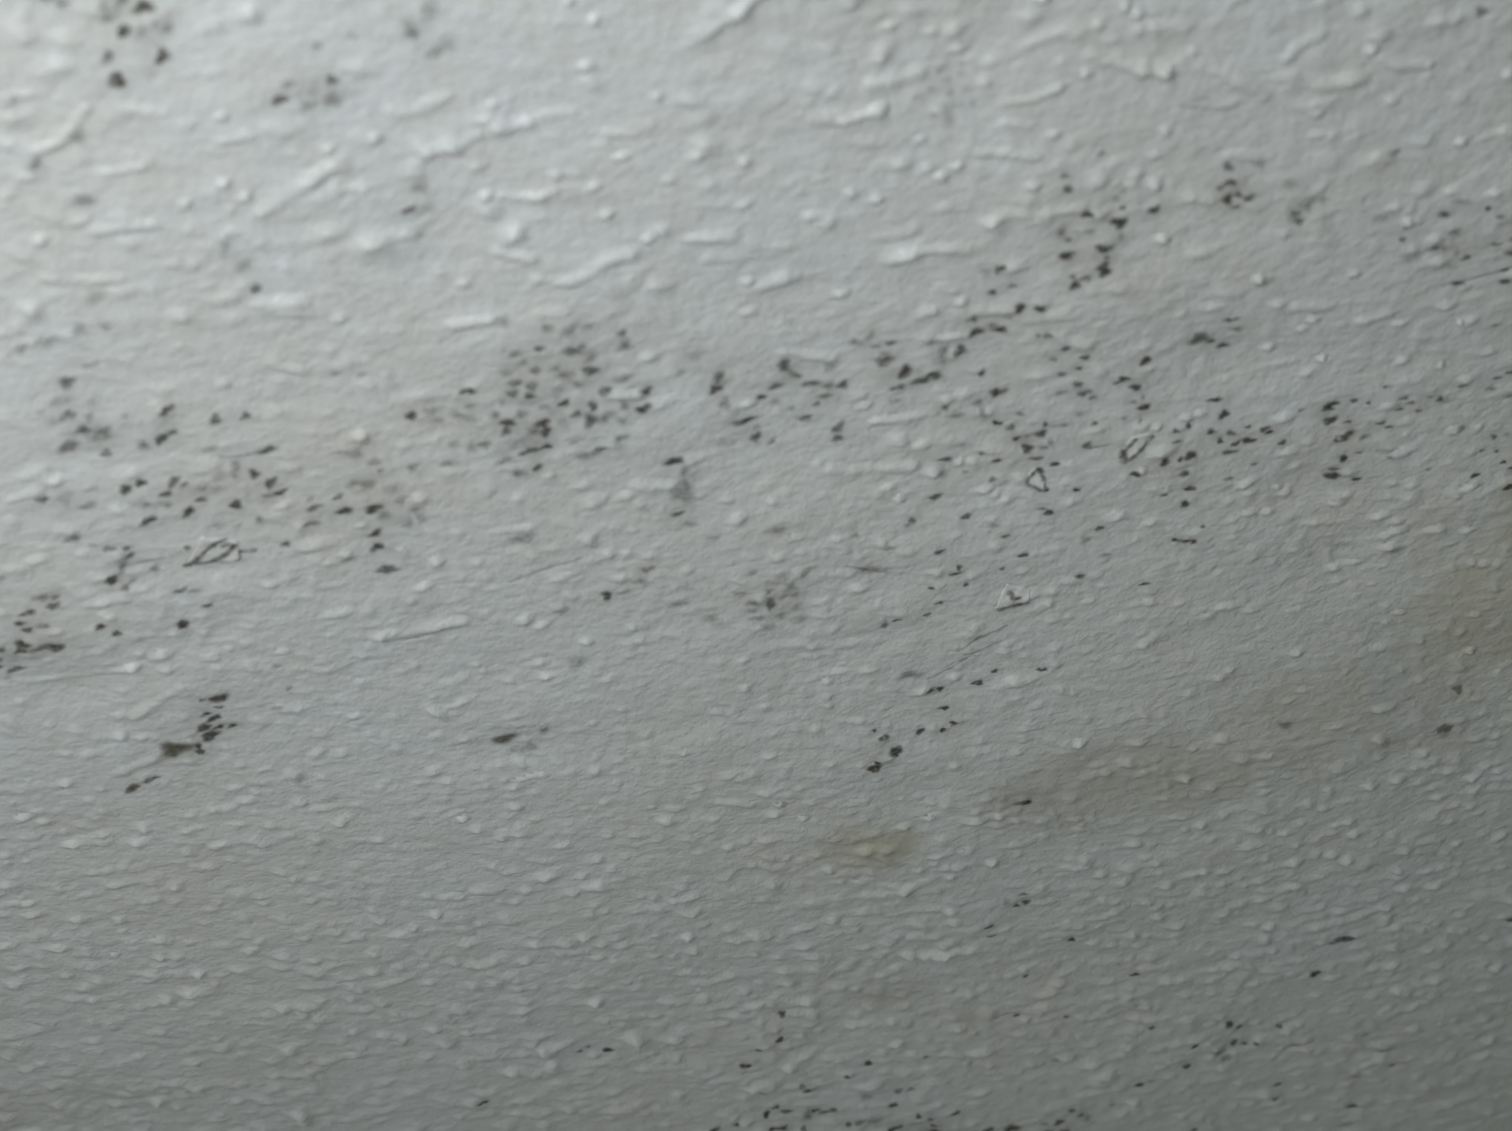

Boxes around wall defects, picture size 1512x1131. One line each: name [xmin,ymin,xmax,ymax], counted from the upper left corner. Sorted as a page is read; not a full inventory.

damp [1070,246,1111,289]
damp [880,342,940,390]
damp [1114,357,1150,410]
damp [992,421,1059,466]
damp [1160,423,1195,507]
damp [1208,398,1285,454]
damp [1323,399,1370,481]
damp [333,498,393,572]
damp [0,597,63,672]
damp [164,694,237,757]
damp [868,730,902,772]
damp [917,687,957,735]